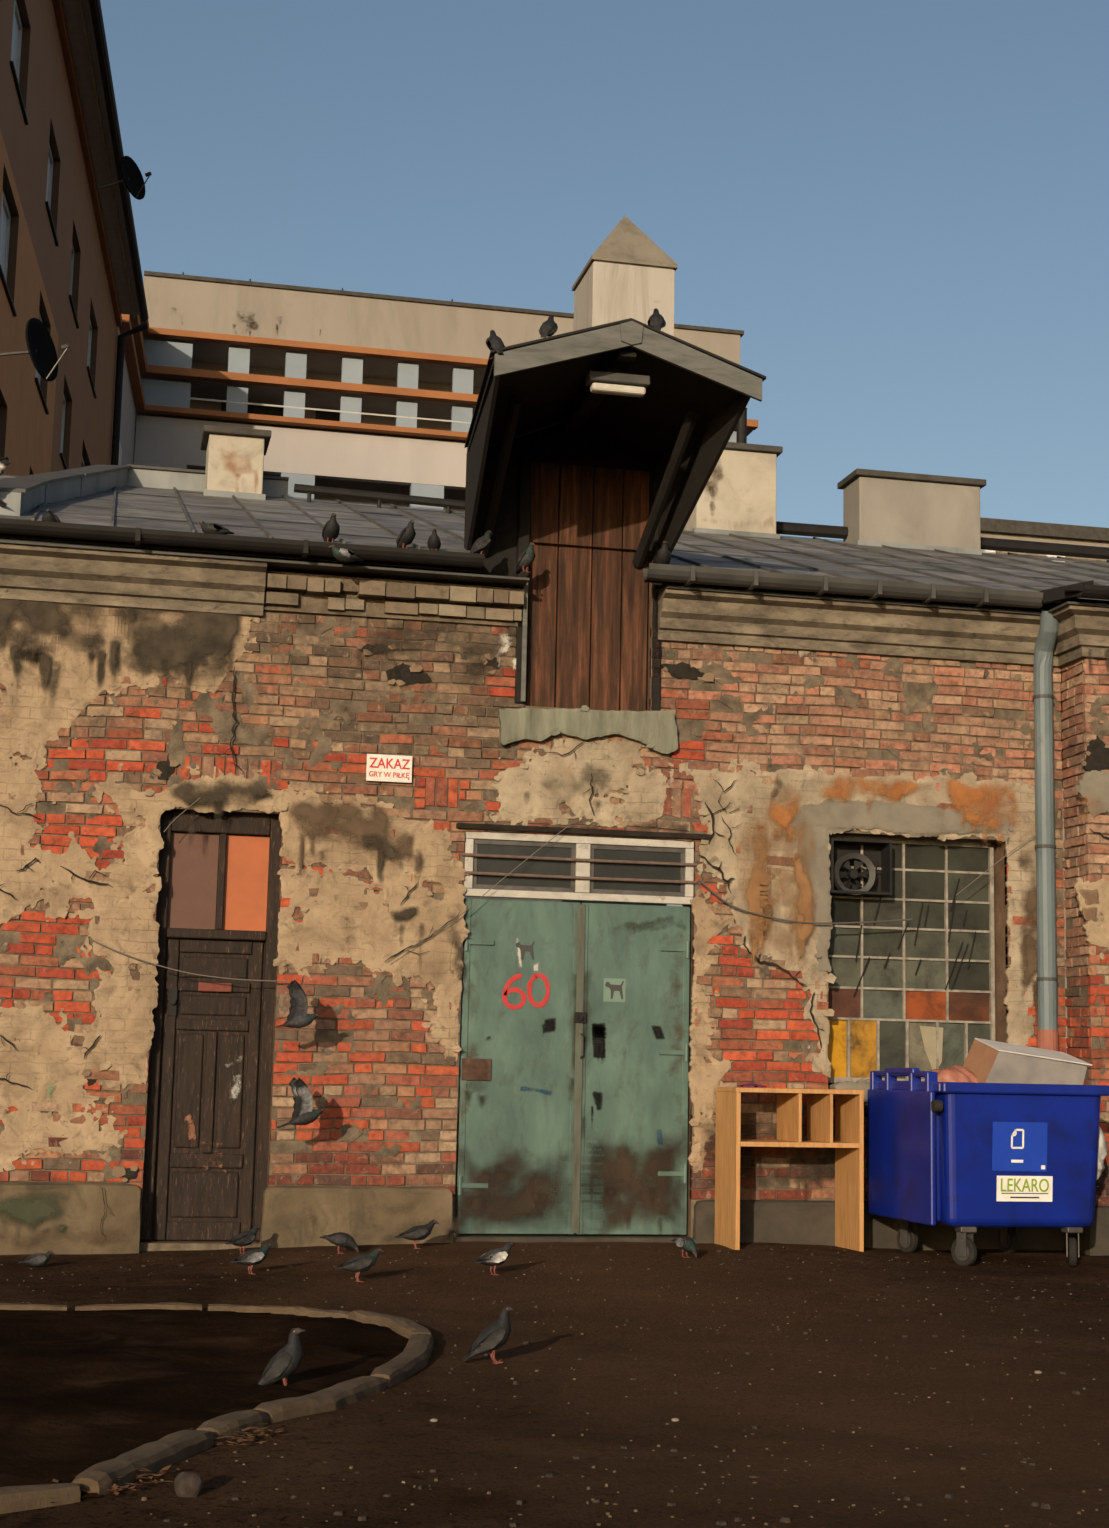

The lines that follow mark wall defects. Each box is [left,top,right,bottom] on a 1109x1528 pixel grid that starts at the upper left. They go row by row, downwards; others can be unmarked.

damp [0,599,240,698]
damp [291,802,422,880]
flaking render [0,604,1038,1182]
rust [746,779,797,960]
rust [794,857,814,955]
rust [824,777,918,801]
rust [948,779,1016,839]
spalling [1081,735,1109,772]
flaking render [1057,997,1066,1053]
flaking render [1070,869,1109,1164]
rust [456,1155,560,1223]
rust [580,1143,681,1227]